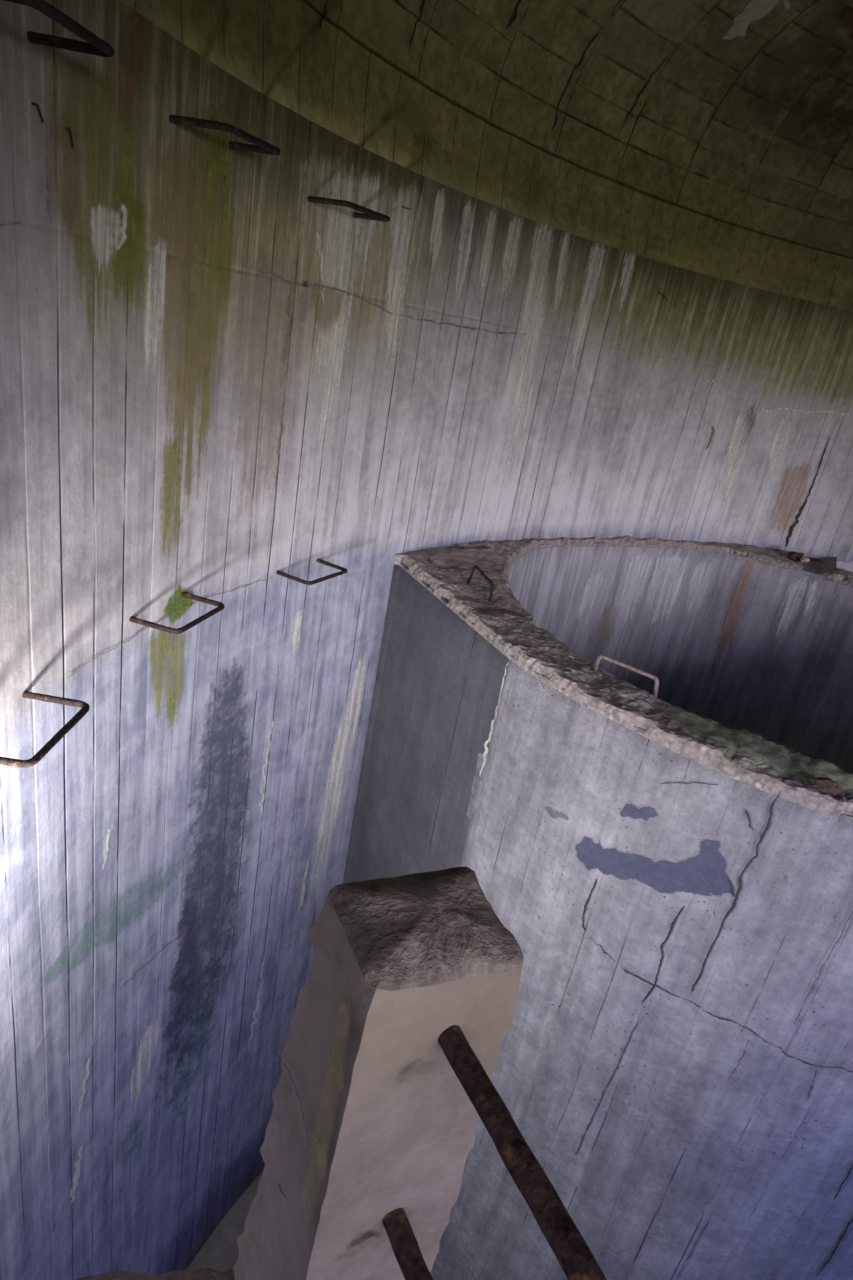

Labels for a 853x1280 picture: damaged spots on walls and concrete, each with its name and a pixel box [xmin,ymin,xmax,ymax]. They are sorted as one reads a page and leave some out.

peeling [722,0,791,40]
damp [51,63,233,554]
damp [297,157,445,438]
crack [246,266,518,334]
damp [456,203,568,464]
crack [785,437,830,547]
damp [130,666,274,1107]
damp [620,804,658,821]
damp [575,836,731,896]
crack [661,779,719,787]
crack [573,791,853,1160]
crack [815,1165,853,1278]